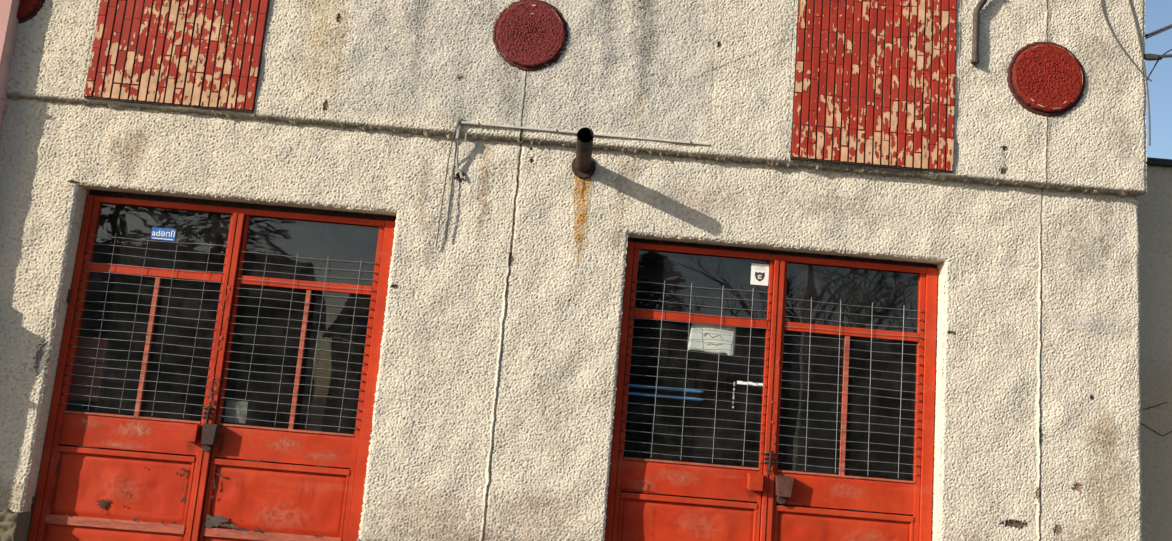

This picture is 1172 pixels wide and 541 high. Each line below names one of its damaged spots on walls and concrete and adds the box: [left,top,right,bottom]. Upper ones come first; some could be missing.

peeling [85,0,258,109]
flaking render [785,0,956,174]
crack [1044,0,1052,40]
crack [1043,117,1051,186]
corrosion [574,178,587,242]
crack [487,72,528,495]
flaking render [999,519,1028,530]